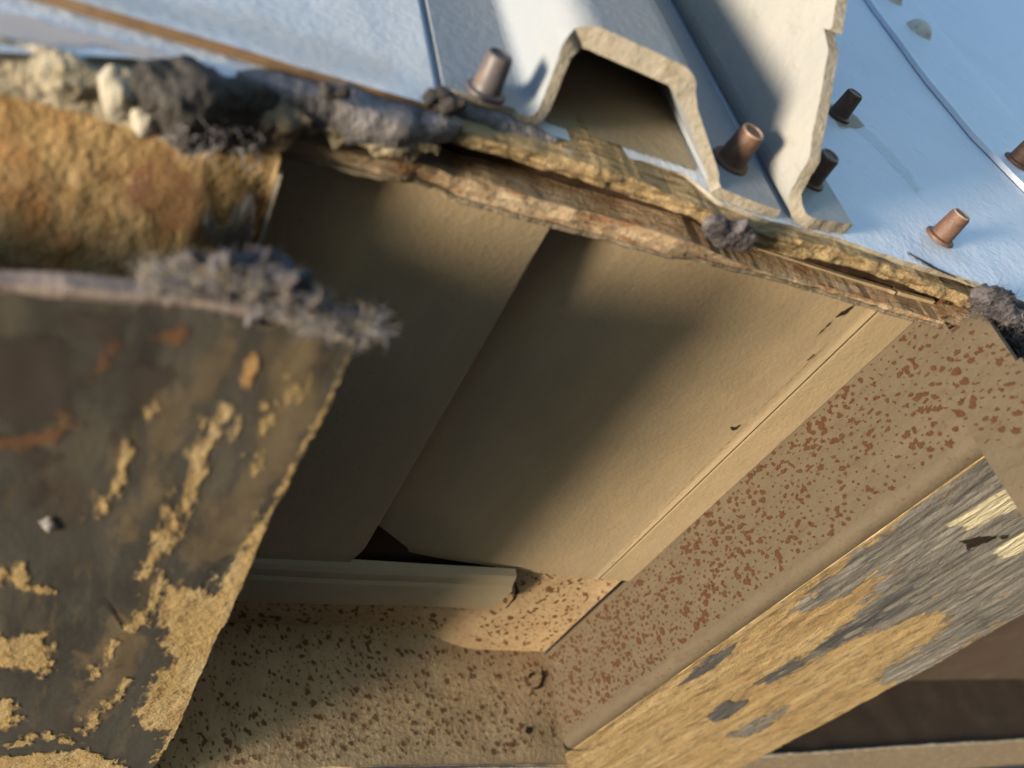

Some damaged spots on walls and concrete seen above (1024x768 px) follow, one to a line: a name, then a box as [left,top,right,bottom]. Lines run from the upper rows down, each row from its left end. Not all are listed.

crack [908,252,979,287]
peeling [259,376,310,435]
peeling [300,373,341,452]
peeling [0,562,57,595]
peeling [89,403,296,763]
corrosion [158,299,1024,768]
peeling [776,459,1024,686]
peeling [0,631,56,679]
peeling [0,678,131,768]
peeling [706,700,790,738]